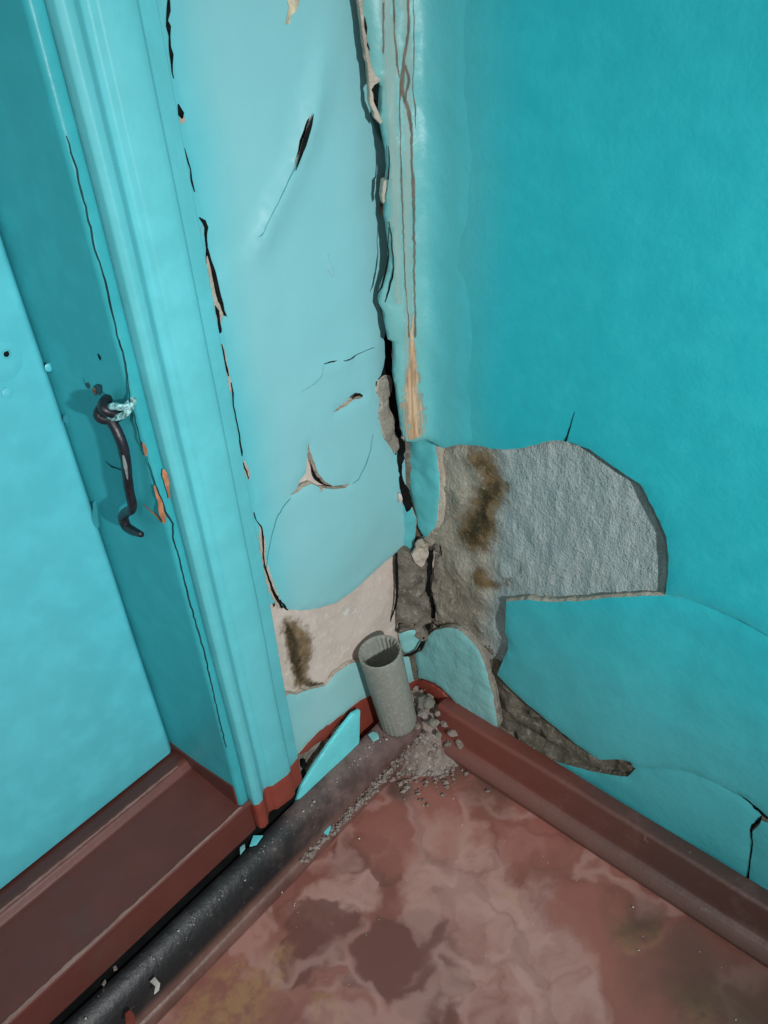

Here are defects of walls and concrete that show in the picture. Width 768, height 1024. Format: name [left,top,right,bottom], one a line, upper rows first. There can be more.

crack [66,136,227,748]
crack [166,0,174,79]
crack [199,217,250,480]
crack [259,114,314,237]
leakage [284,619,323,688]
spalling [298,740,326,779]
crack [303,332,442,657]
crack [356,0,394,302]
corrosion [382,0,423,440]
spalling [270,440,669,773]
leakage [459,452,509,550]
leakage [473,568,508,588]